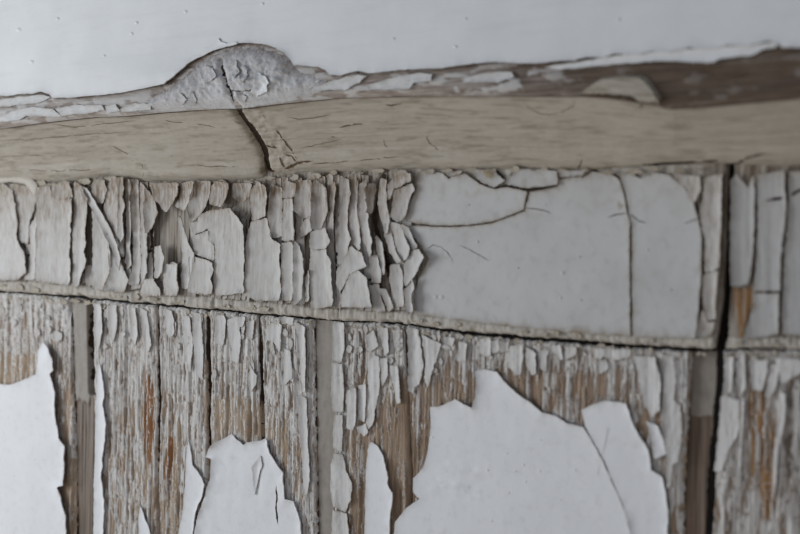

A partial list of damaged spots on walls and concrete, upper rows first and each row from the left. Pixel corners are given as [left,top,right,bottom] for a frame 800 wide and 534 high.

crack [7,121,152,194]
crack [221,64,394,290]
peeling [0,0,800,122]
crack [0,154,800,484]
peeling [0,165,800,534]